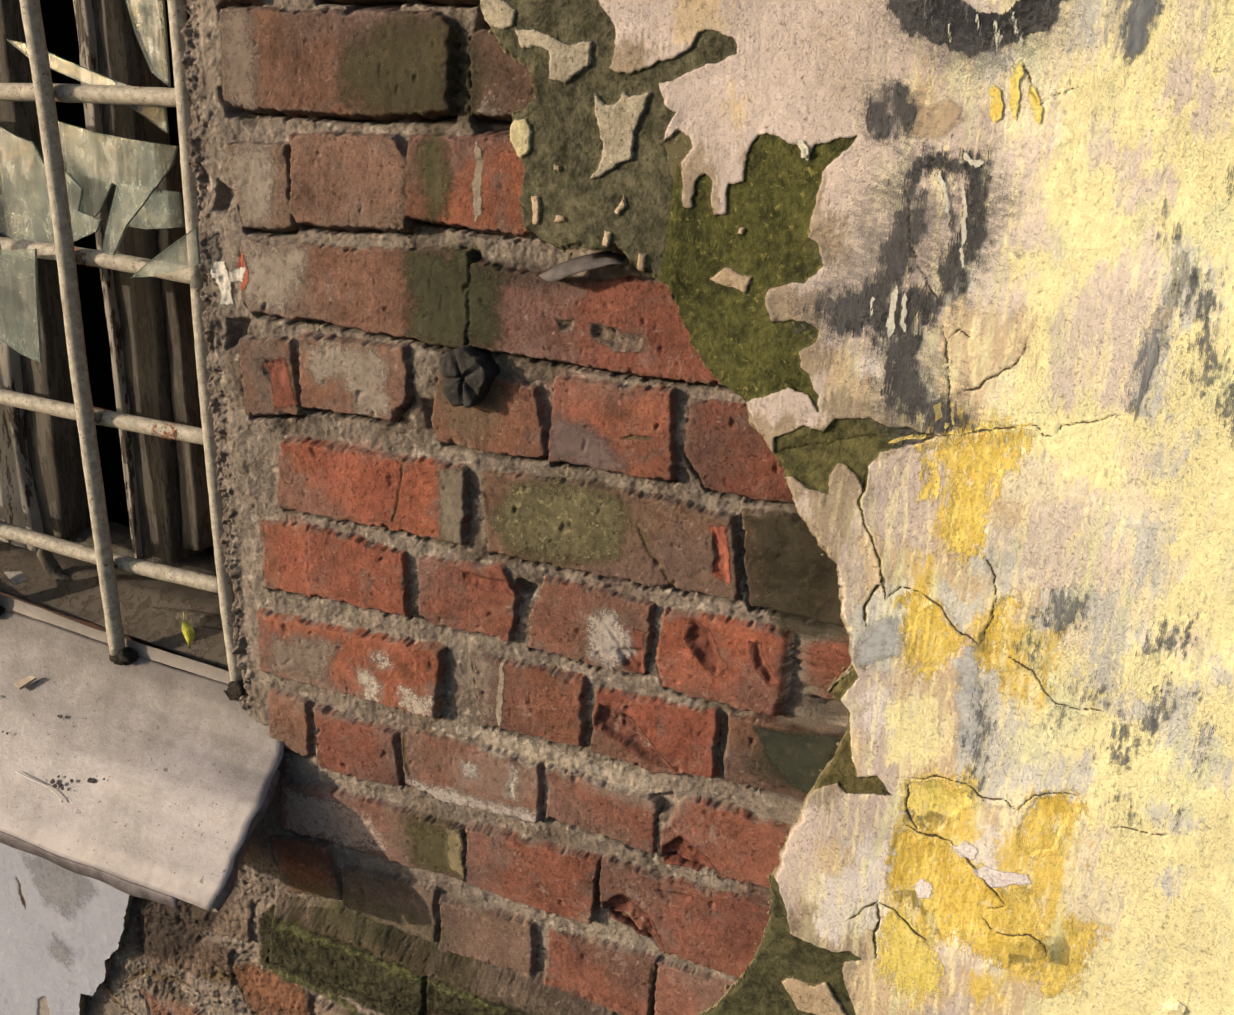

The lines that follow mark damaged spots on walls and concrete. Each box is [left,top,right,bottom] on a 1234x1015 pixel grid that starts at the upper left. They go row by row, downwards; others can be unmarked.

flaking render [480,0,857,412]
crack [783,200,1118,450]
flaking render [773,418,906,502]
crack [857,470,997,643]
peeling [914,419,1045,565]
spalling [683,618,727,678]
crack [1008,656,1101,711]
spalling [601,893,665,953]
spalling [660,835,721,877]
crack [850,902,926,958]
peeling [697,664,1112,1015]
crack [904,775,1073,956]